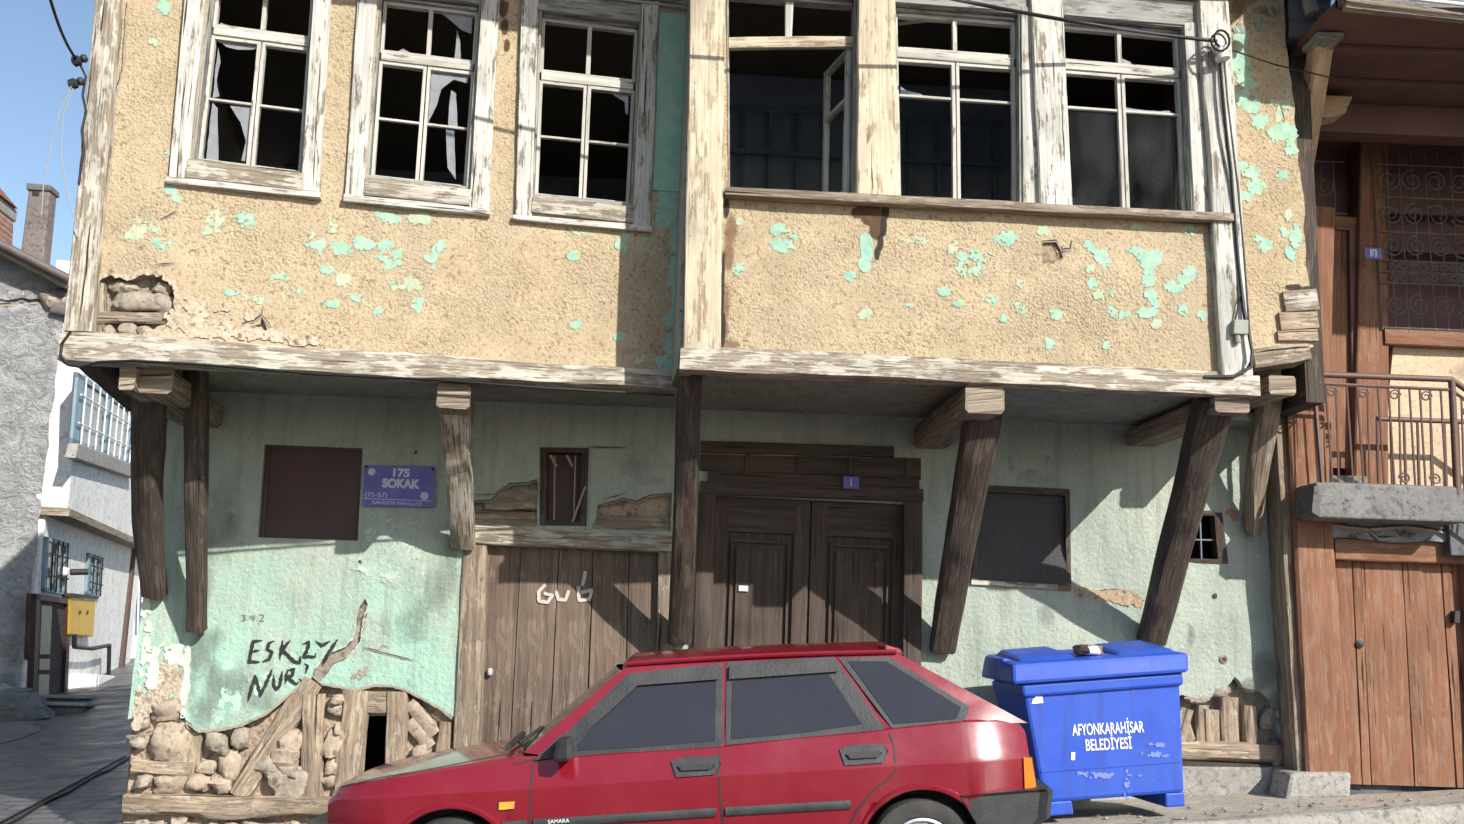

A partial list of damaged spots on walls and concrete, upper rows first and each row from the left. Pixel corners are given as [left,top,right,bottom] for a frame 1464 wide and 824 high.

peeling [1231,0,1299,203]
peeling [201,203,258,238]
spalling [97,210,447,347]
peeling [935,230,1018,308]
spalling [1037,225,1062,264]
peeling [1083,221,1212,329]
peeling [1253,208,1303,265]
spalling [474,481,538,526]
spalling [590,495,672,532]
spalling [1075,587,1145,609]
spalling [122,598,455,824]
spalling [1180,681,1282,767]